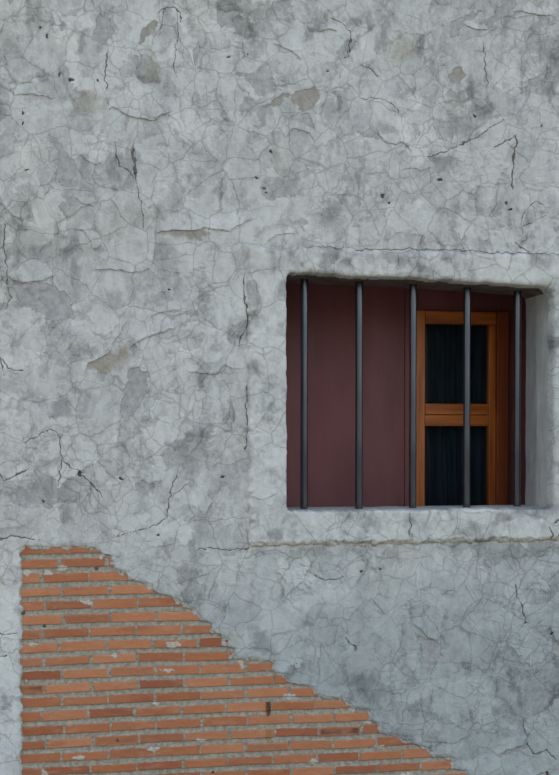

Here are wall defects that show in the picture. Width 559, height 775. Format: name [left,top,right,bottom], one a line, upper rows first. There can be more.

spalling [138,20,158,45]
crack [331,18,377,76]
spalling [448,67,465,84]
spalling [263,86,320,133]
crack [115,142,144,216]
crack [427,120,518,189]
crack [312,201,554,255]
crack [239,275,249,344]
crack [242,386,250,450]
crack [25,429,102,497]
crack [113,471,188,538]
spalling [18,545,469,775]